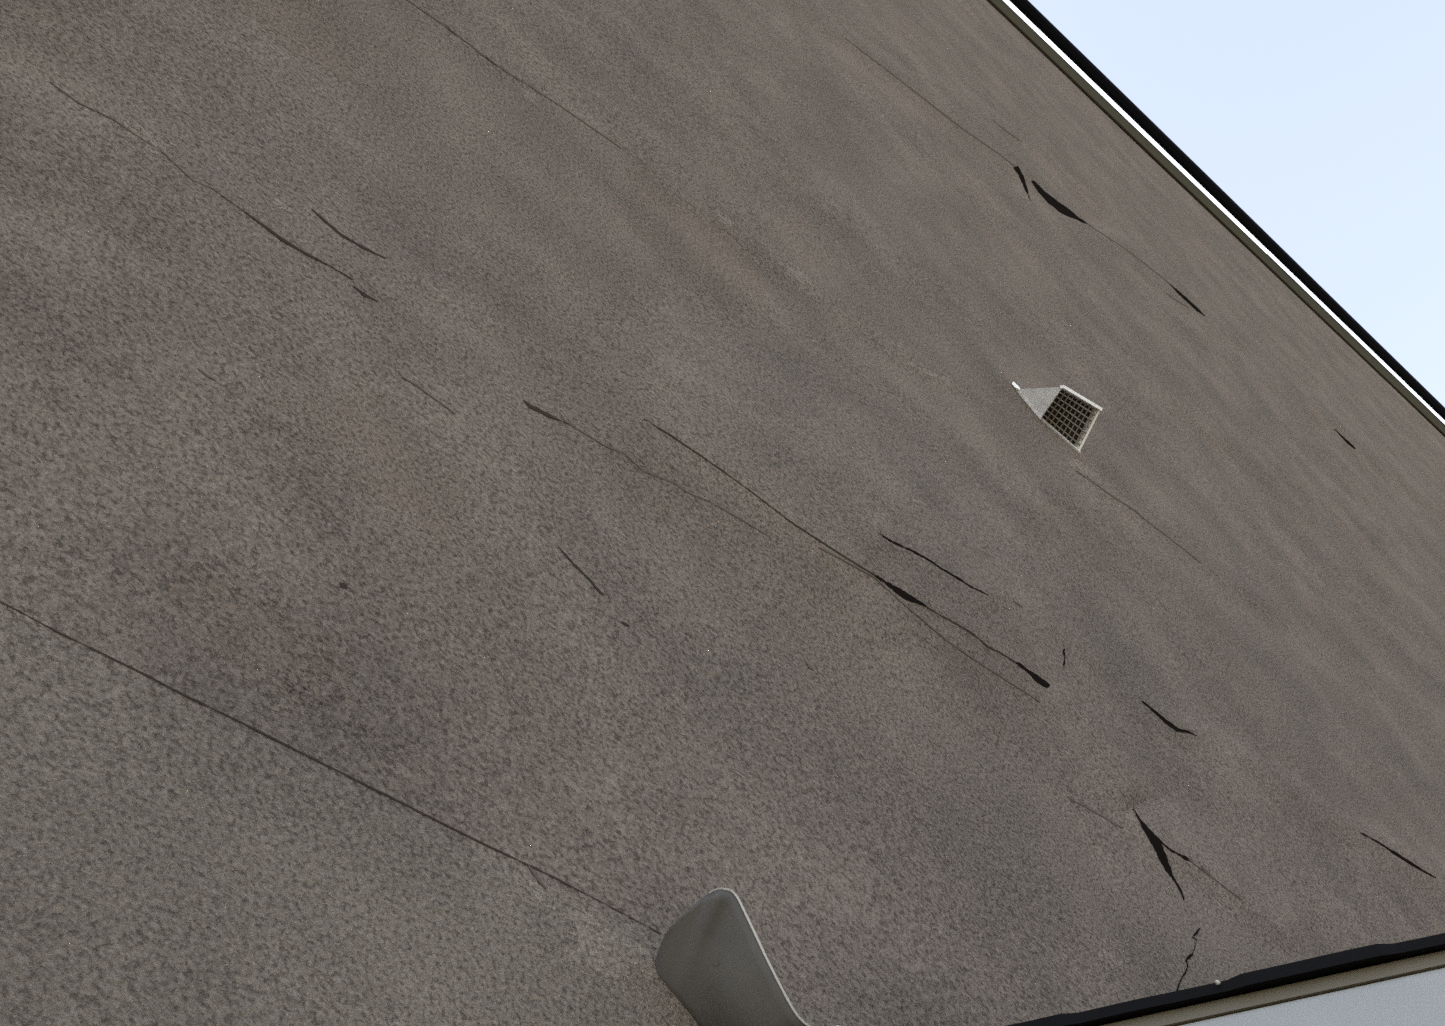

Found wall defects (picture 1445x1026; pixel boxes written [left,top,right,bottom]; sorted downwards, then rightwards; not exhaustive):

crack [50,82,386,302]
crack [845,38,1205,316]
crack [523,400,1065,702]
crack [0,601,661,934]
crack [1067,796,1243,991]
crack [1142,701,1197,736]
crack [1361,832,1436,878]